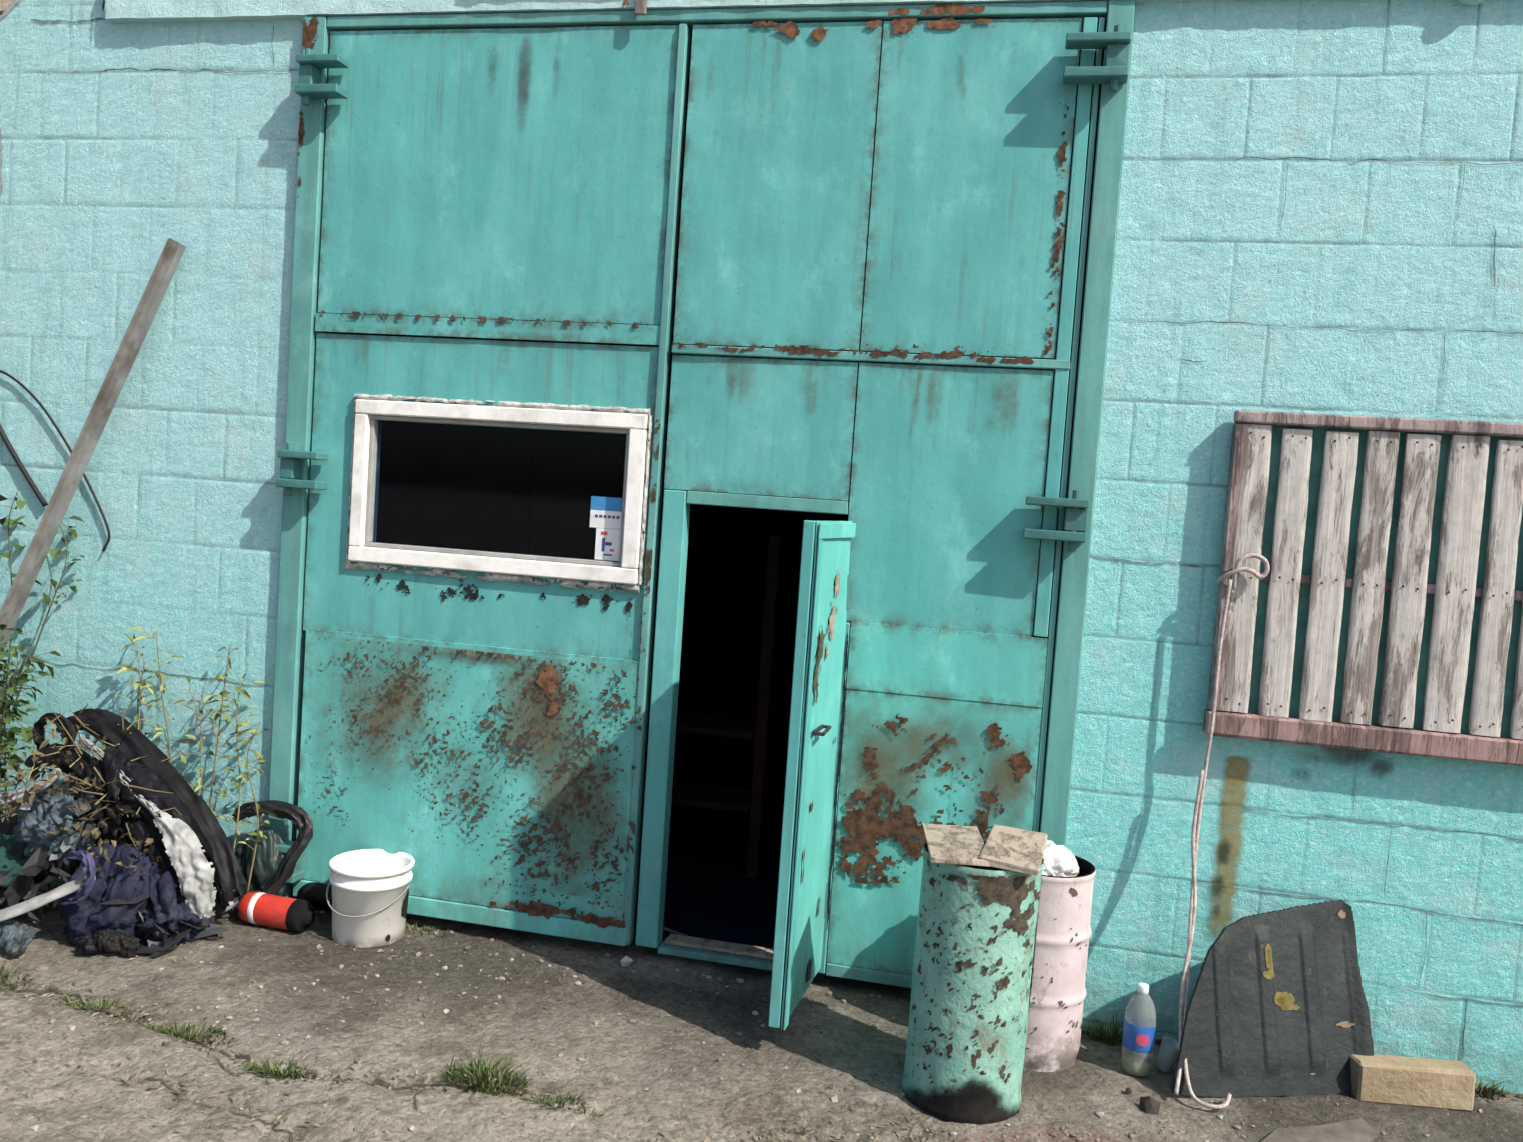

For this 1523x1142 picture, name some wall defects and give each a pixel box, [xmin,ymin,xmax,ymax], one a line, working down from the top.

flaking render [0,0,20,21]
crack [31,0,107,23]
corrosion [752,21,828,41]
corrosion [866,4,998,35]
corrosion [672,103,1069,365]
corrosion [321,310,514,324]
corrosion [534,319,614,327]
corrosion [304,419,660,928]
corrosion [813,626,826,703]
corrosion [838,713,1032,885]
water stain [1210,757,1249,932]
crack [0,981,528,1142]